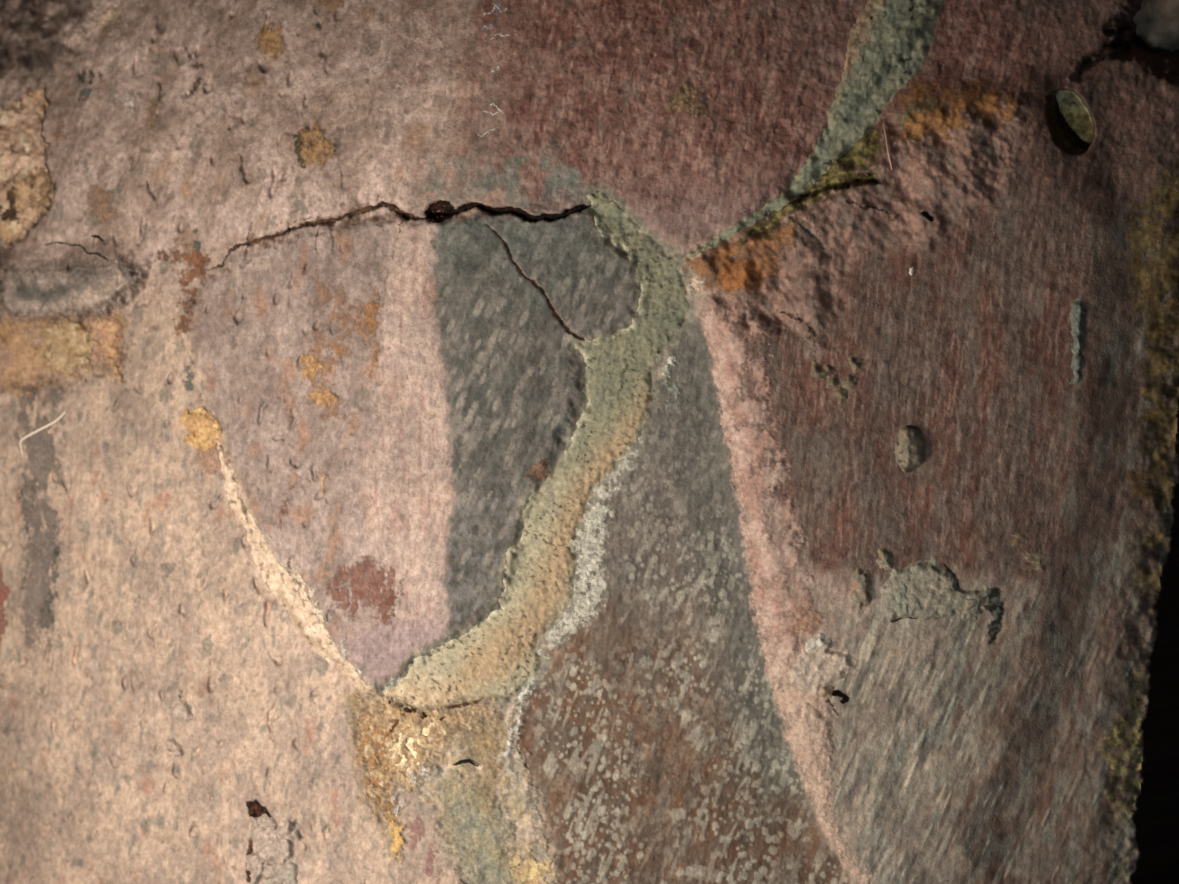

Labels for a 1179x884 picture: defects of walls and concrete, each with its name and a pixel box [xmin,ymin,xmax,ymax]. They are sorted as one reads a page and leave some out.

crack [213,195,591,341]
flaking render [850,548,1004,644]
flaking render [165,692,194,757]
flaking render [244,800,299,884]